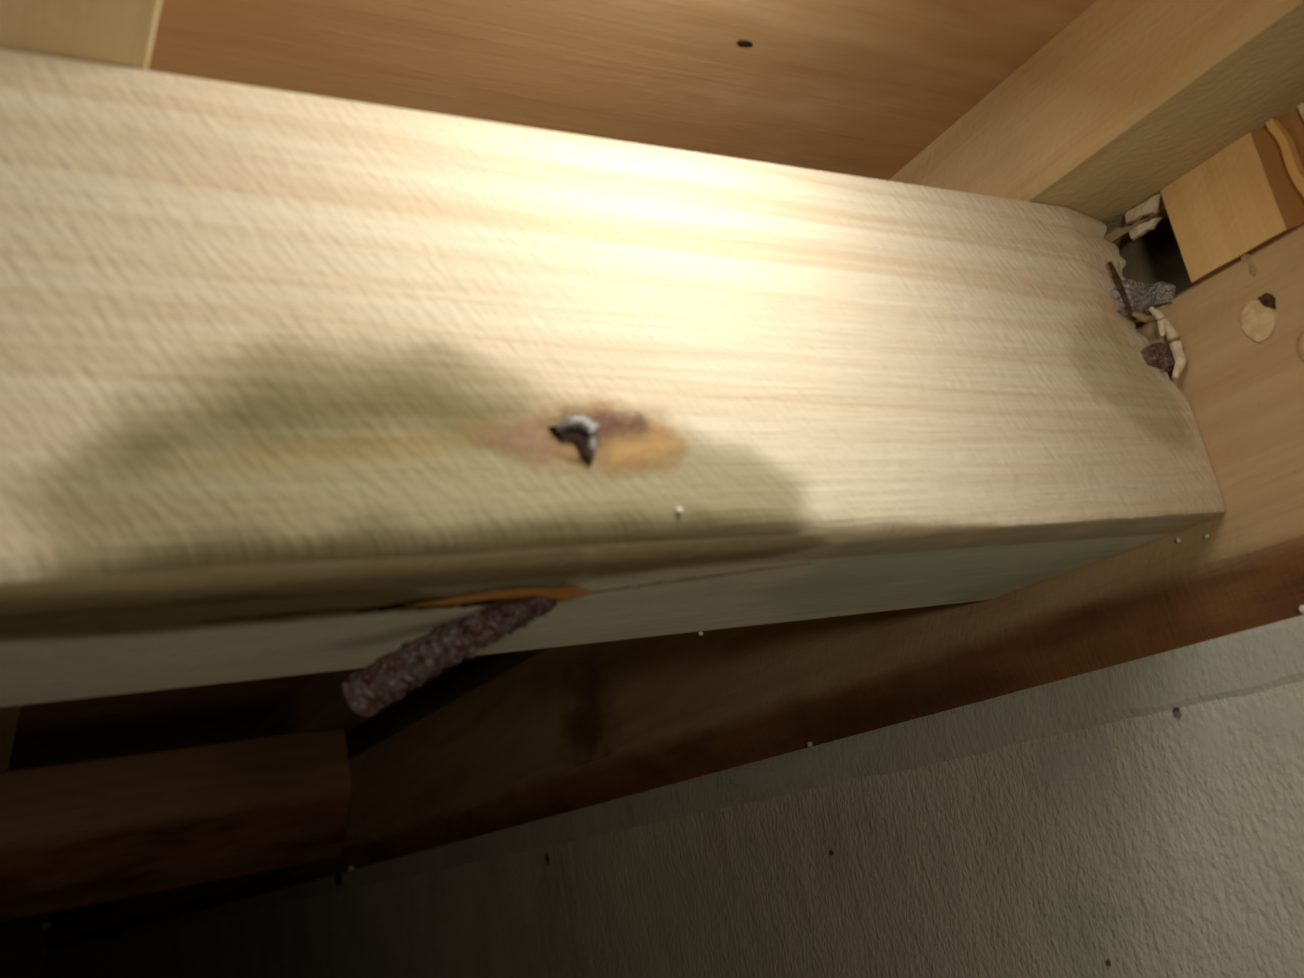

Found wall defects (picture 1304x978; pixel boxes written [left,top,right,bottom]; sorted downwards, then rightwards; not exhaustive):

spalling [1125,194,1162,241]
spalling [1108,261,1187,380]
rust [499,408,676,465]
crack [591,562,811,593]
crack [198,597,523,623]